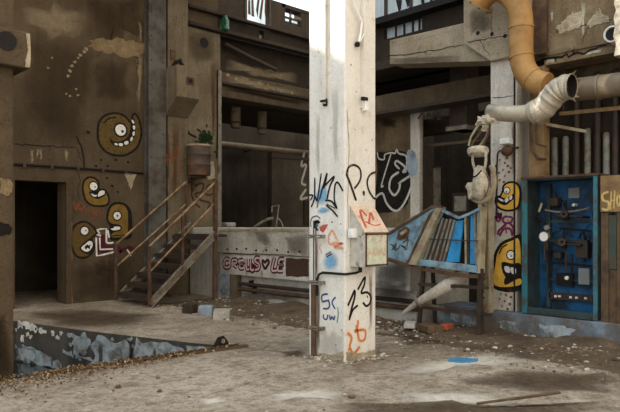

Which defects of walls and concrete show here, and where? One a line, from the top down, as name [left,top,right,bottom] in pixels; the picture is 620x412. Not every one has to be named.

spalling [67,37,144,77]
crack [386,15,508,57]
crack [541,24,607,62]
peeling [556,8,609,34]
spalling [13,320,248,377]
peeling [539,324,575,337]